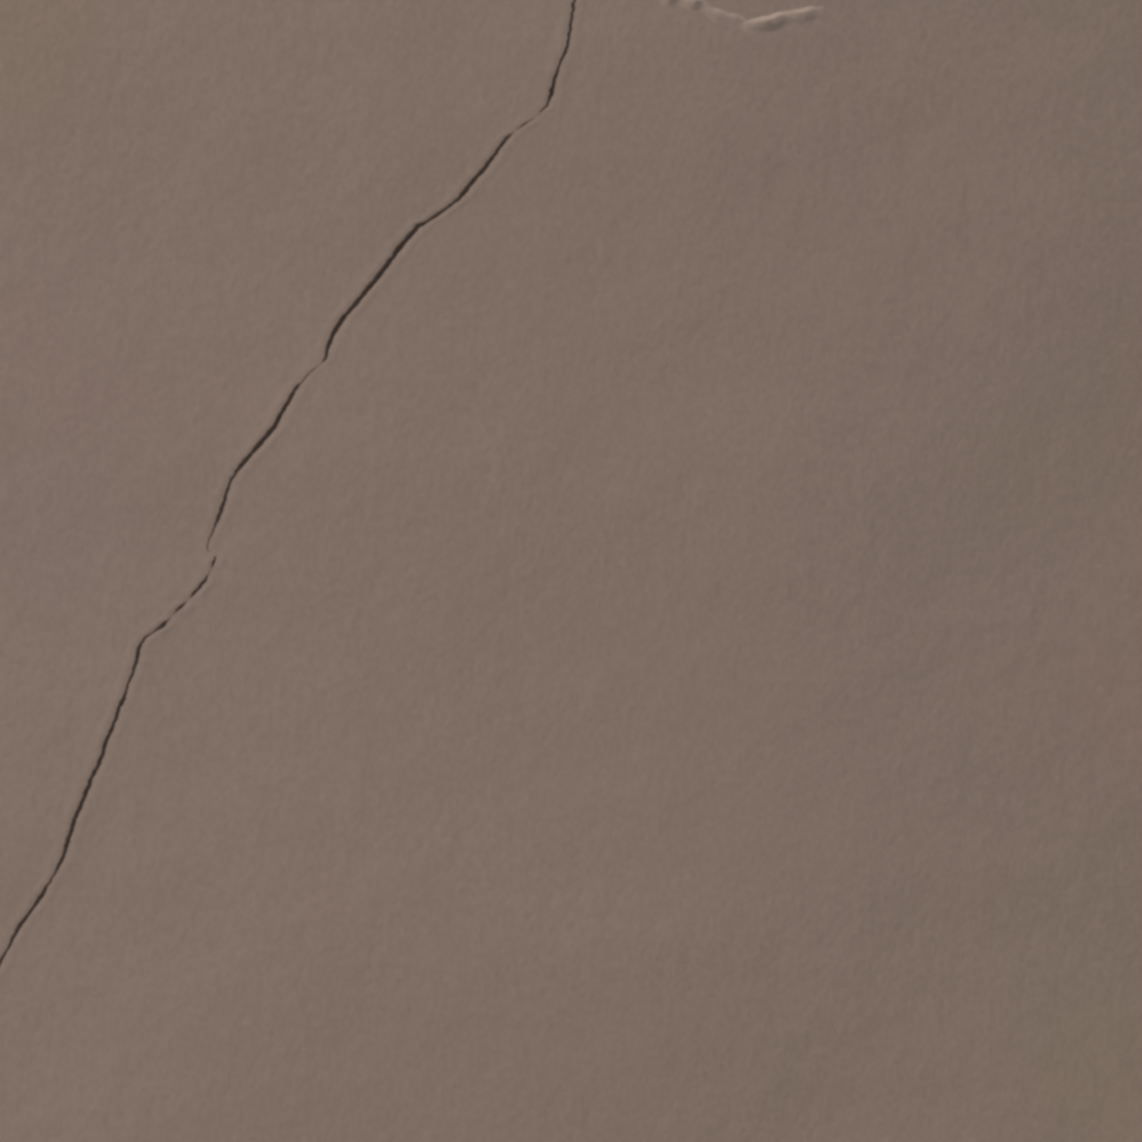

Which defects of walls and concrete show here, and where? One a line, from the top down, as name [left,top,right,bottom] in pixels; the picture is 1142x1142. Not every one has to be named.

crack [0,0,577,967]